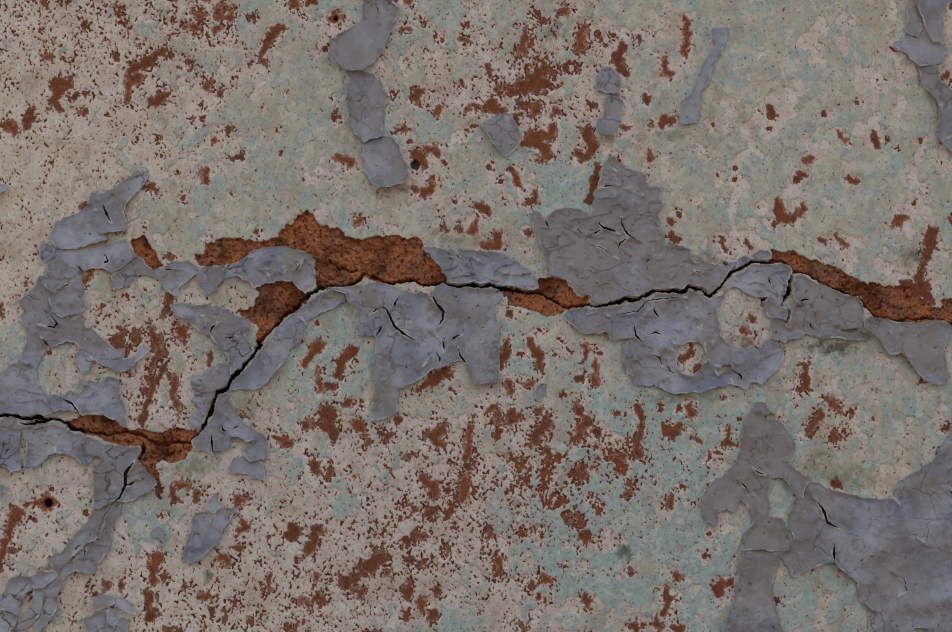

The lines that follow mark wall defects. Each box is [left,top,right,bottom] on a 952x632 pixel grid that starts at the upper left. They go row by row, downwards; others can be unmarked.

peeling [464,63,563,165]
peeling [574,41,631,164]
peeling [648,27,730,129]
peeling [893,0,952,152]
crack [445,282,524,293]
crack [586,260,770,308]
crack [761,279,791,303]
crack [0,414,85,433]
crack [197,341,263,436]